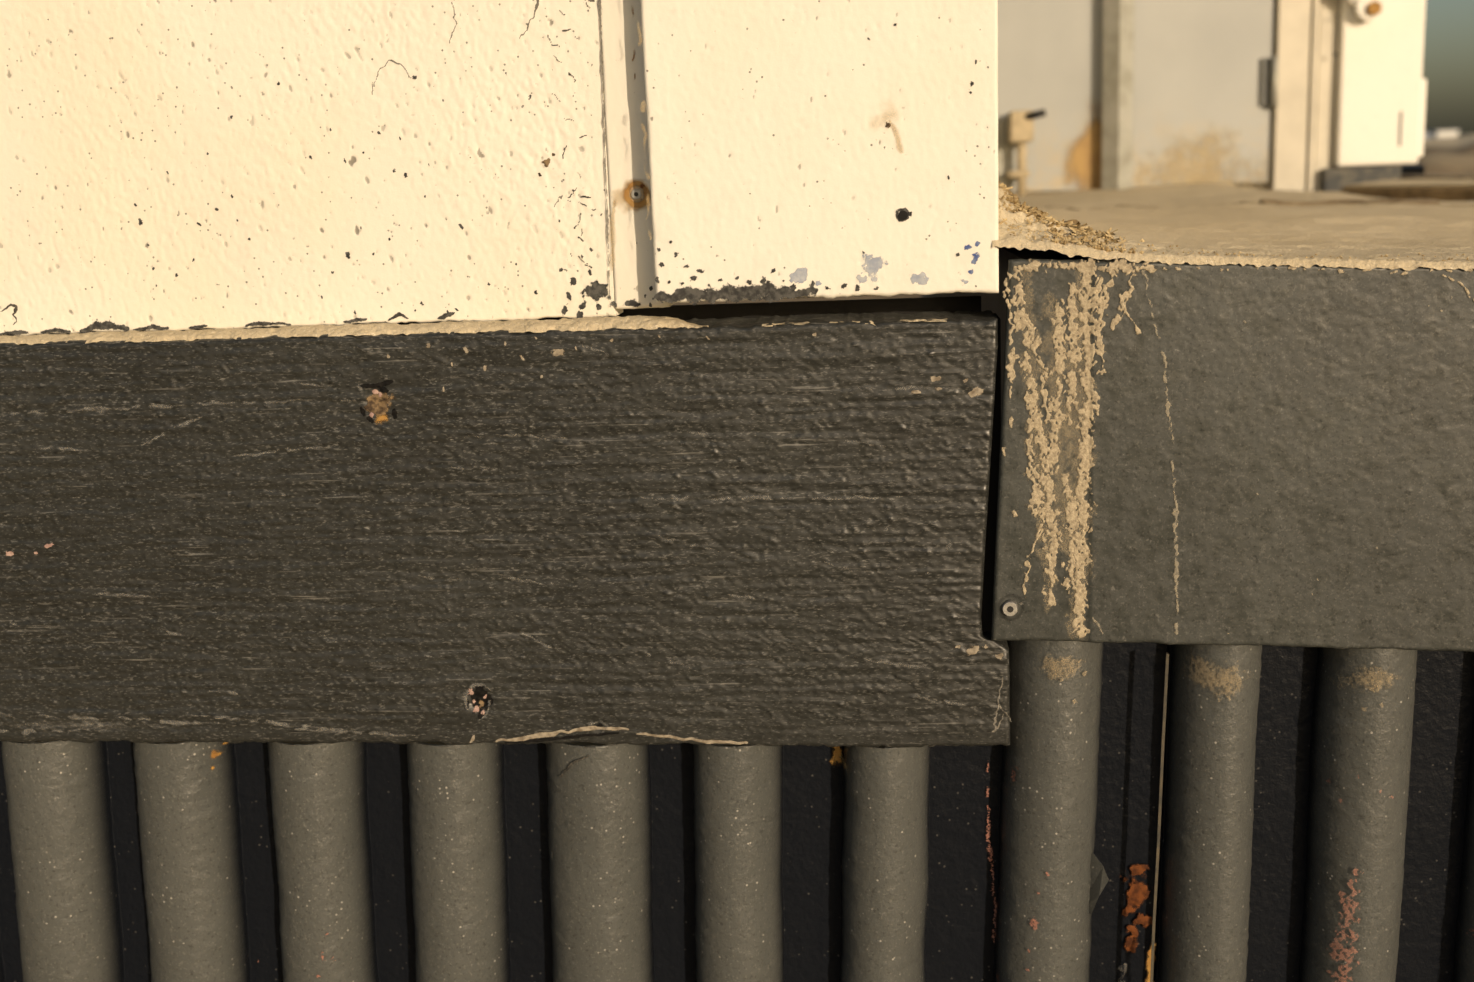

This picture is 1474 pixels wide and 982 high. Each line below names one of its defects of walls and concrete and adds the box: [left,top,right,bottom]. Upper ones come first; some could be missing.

rust [1122,864,1156,982]